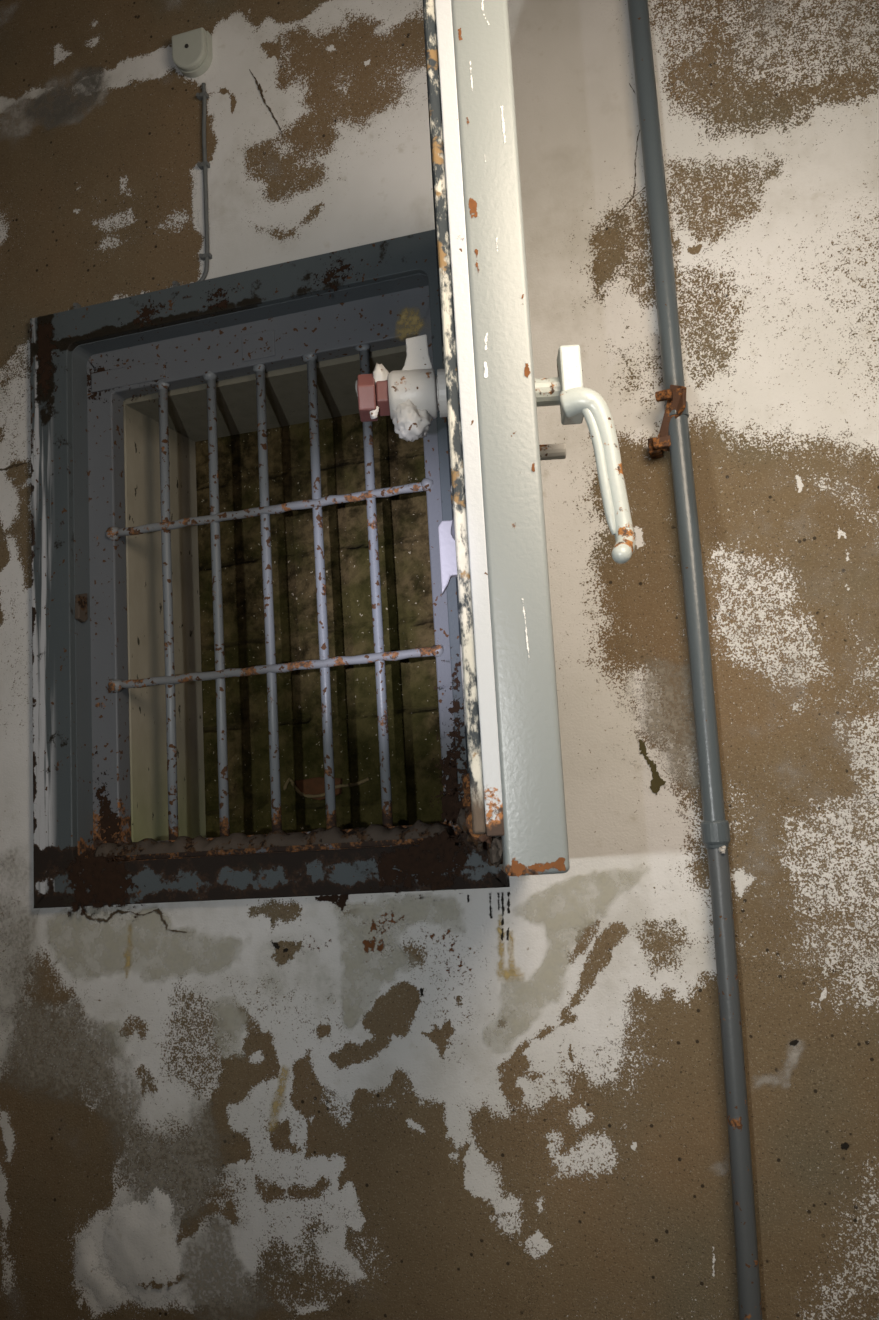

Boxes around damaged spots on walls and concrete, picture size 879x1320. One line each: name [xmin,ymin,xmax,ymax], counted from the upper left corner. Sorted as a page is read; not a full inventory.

crack [249,69,282,134]
peeling [0,0,427,735]
corrosion [52,772,146,967]
corrosion [315,894,350,911]
peeling [0,176,739,1320]
corrosion [362,647,503,963]
peeling [648,0,879,1320]